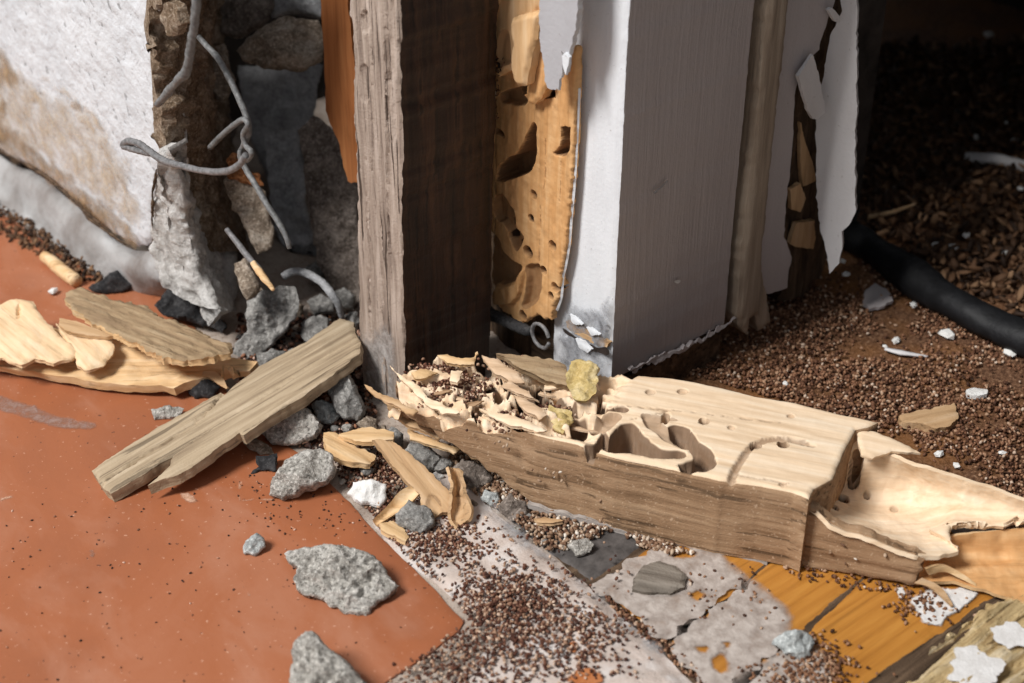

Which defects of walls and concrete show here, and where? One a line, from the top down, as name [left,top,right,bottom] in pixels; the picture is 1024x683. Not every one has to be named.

peeling [539,0,583,91]
peeling [795,54,825,119]
peeling [825,7,840,22]
spalling [144,0,249,326]